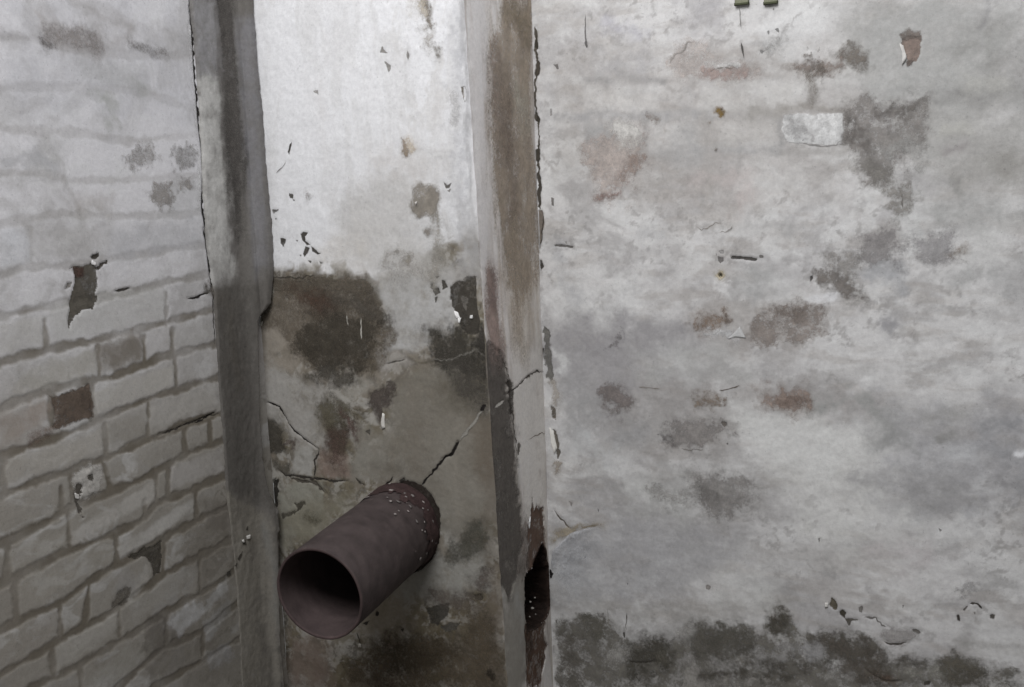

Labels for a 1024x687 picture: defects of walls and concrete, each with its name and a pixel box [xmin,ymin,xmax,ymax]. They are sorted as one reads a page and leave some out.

crack [188,9,215,341]
damp [487,0,539,323]
crack [534,27,542,208]
peeling [781,113,844,147]
damp [842,94,927,215]
peeling [66,252,107,328]
damp [384,183,441,291]
flaking render [52,383,94,429]
crack [269,402,347,491]
flaking render [431,276,523,599]
crack [422,370,541,485]
damp [554,606,1019,687]